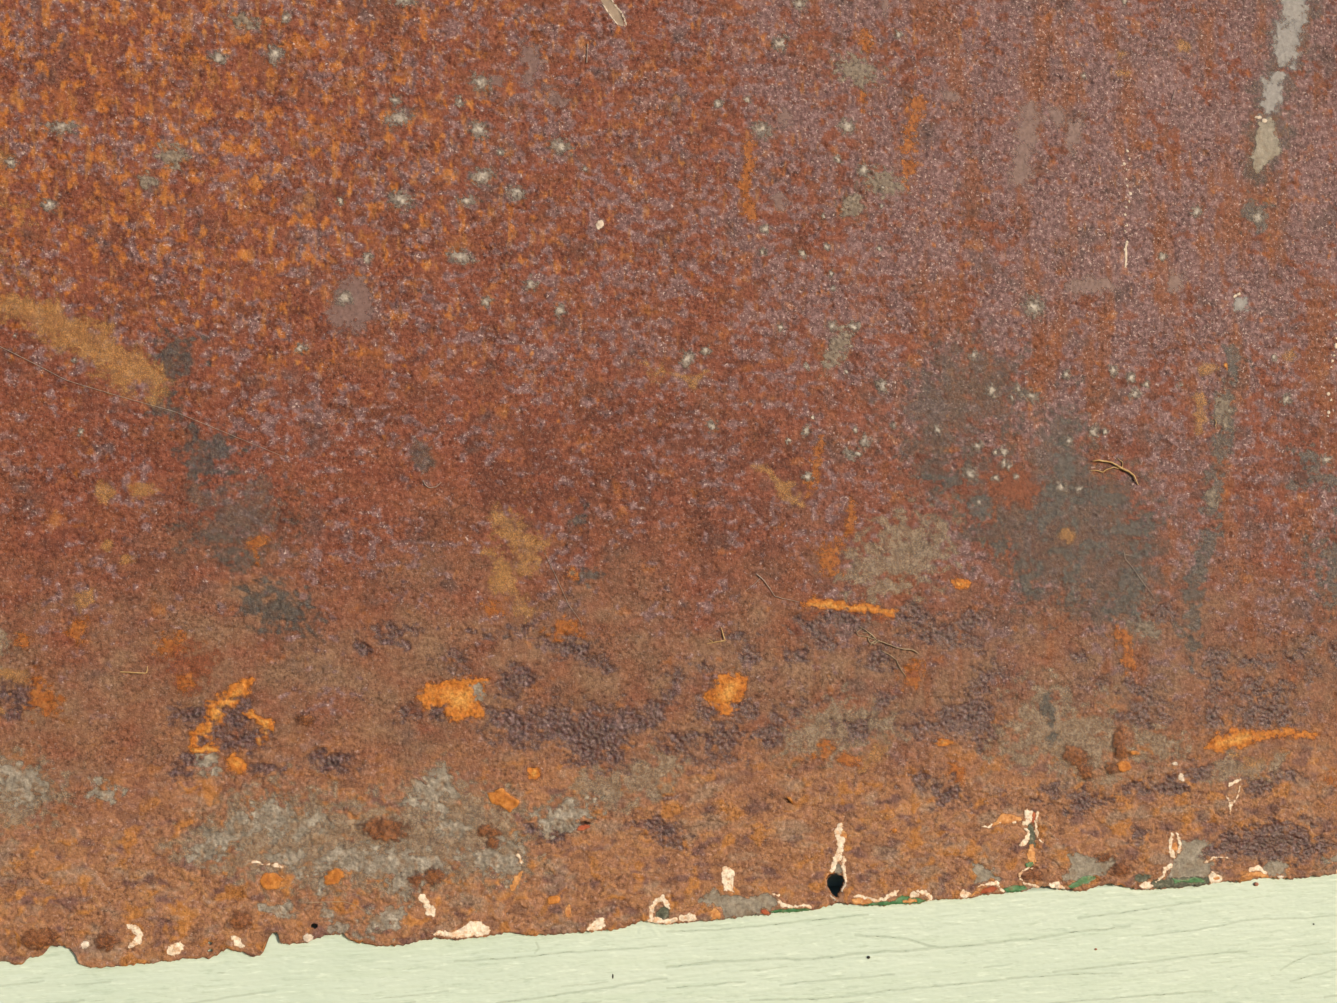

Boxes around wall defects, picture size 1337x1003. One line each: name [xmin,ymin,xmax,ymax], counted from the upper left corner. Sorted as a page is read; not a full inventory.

corrosion [988,466,1041,510]
corrosion [1203,708,1320,753]
spalling [960,758,1212,899]
spalling [1135,768,1337,889]
peeling [829,822,933,906]
corrosion [1021,866,1043,880]
peeling [647,866,812,925]
corrosion [20,928,59,950]
corrosion [95,932,119,952]
peeling [126,924,144,949]
peeling [166,941,185,957]
corrosion [229,911,252,929]